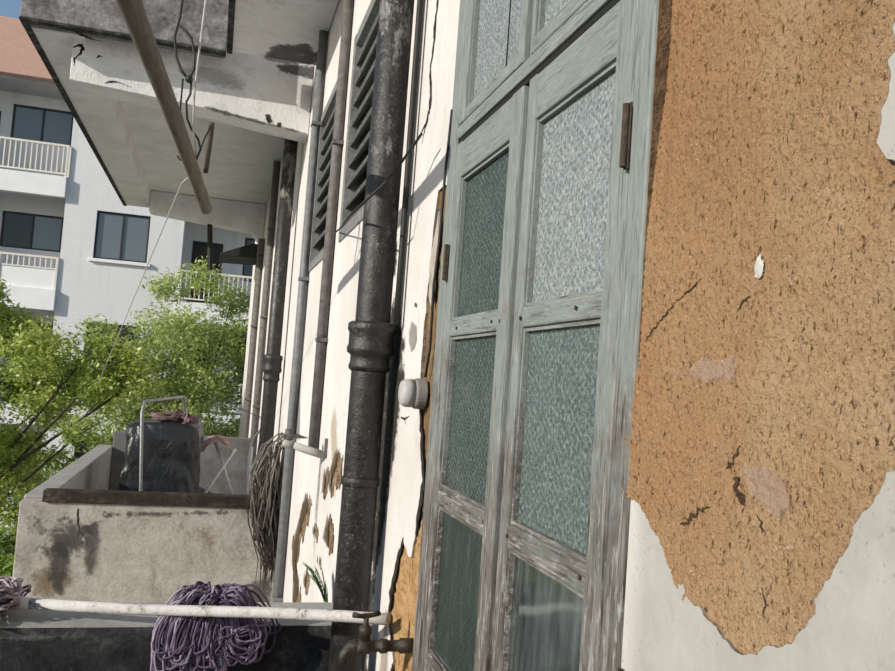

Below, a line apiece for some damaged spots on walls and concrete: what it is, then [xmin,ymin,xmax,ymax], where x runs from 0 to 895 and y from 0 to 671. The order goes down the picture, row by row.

water stain [264,43,317,79]
flaking render [621,0,895,655]
flaking render [388,185,447,640]
flaking render [322,449,343,500]
water stain [34,511,171,595]
flaking render [291,493,334,602]
flaking render [390,652,413,671]